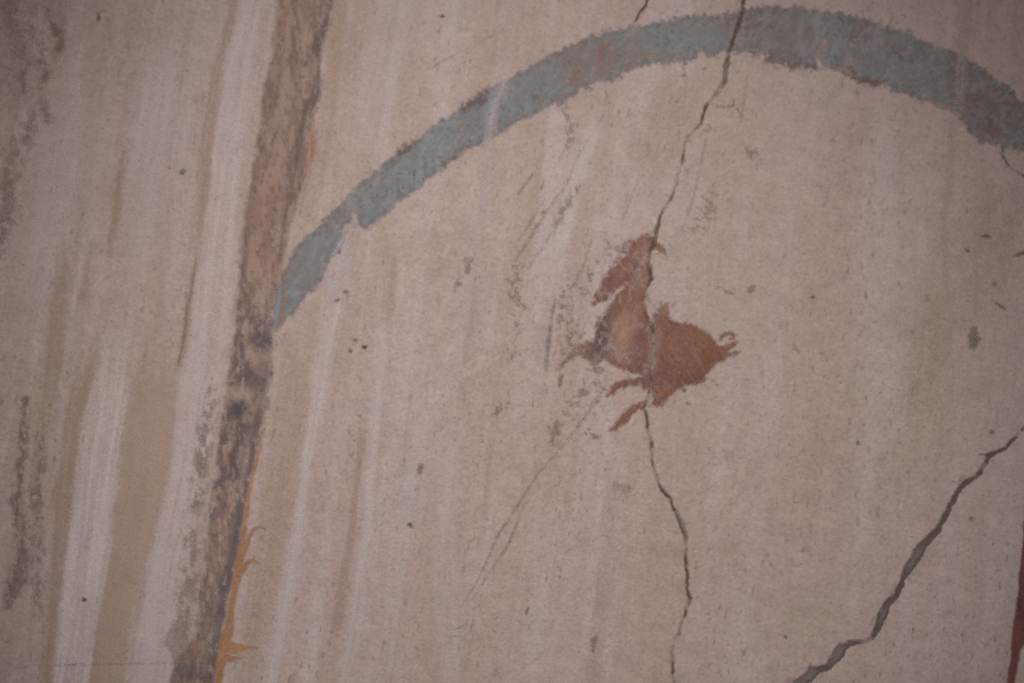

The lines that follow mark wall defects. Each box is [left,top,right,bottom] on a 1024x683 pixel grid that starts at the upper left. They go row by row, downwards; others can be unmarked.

crack [634,0,649,22]
crack [642,0,746,683]
crack [782,428,1024,683]